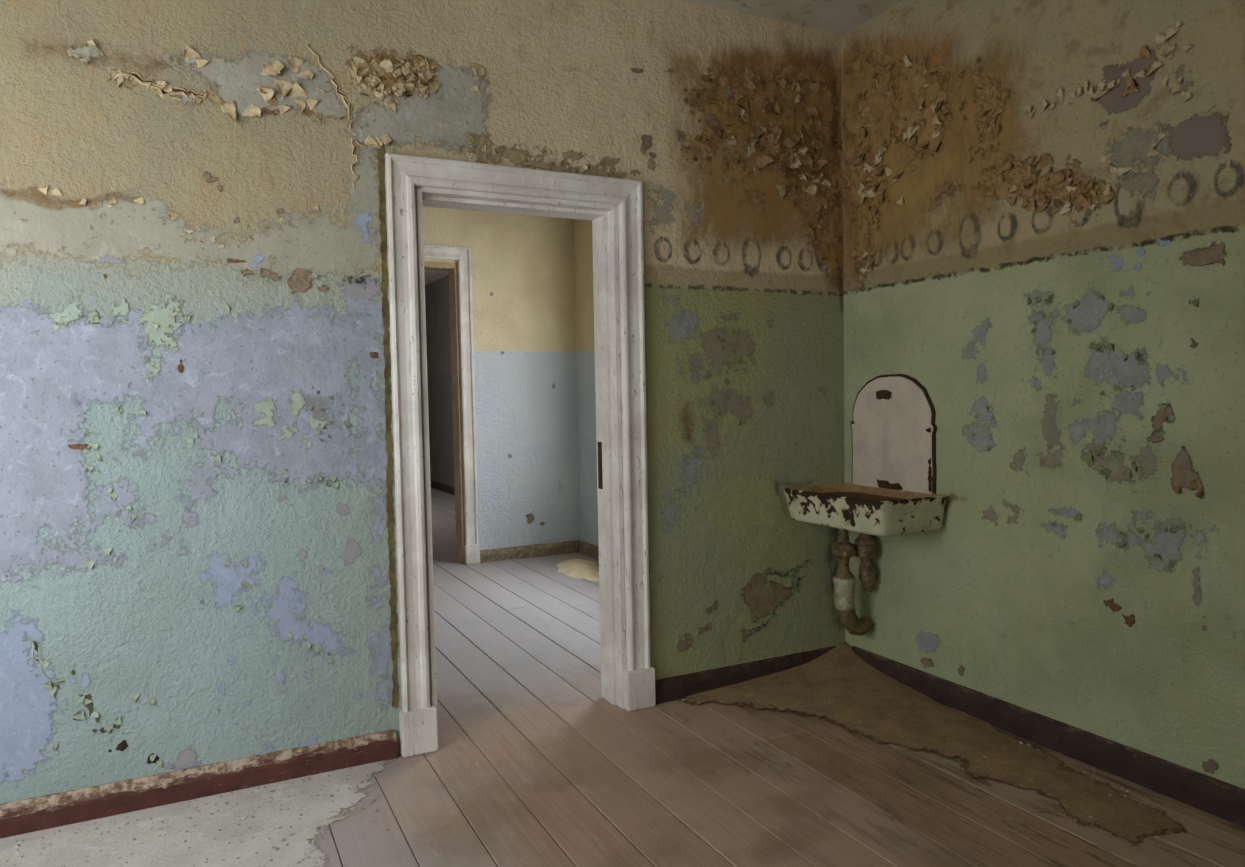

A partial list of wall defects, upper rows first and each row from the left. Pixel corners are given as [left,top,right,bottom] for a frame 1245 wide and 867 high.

leakage [676,39,1020,286]
peeling [0,44,704,710]
peeling [961,317,997,452]
peeling [1009,248,1219,631]
flaking render [739,567,799,642]